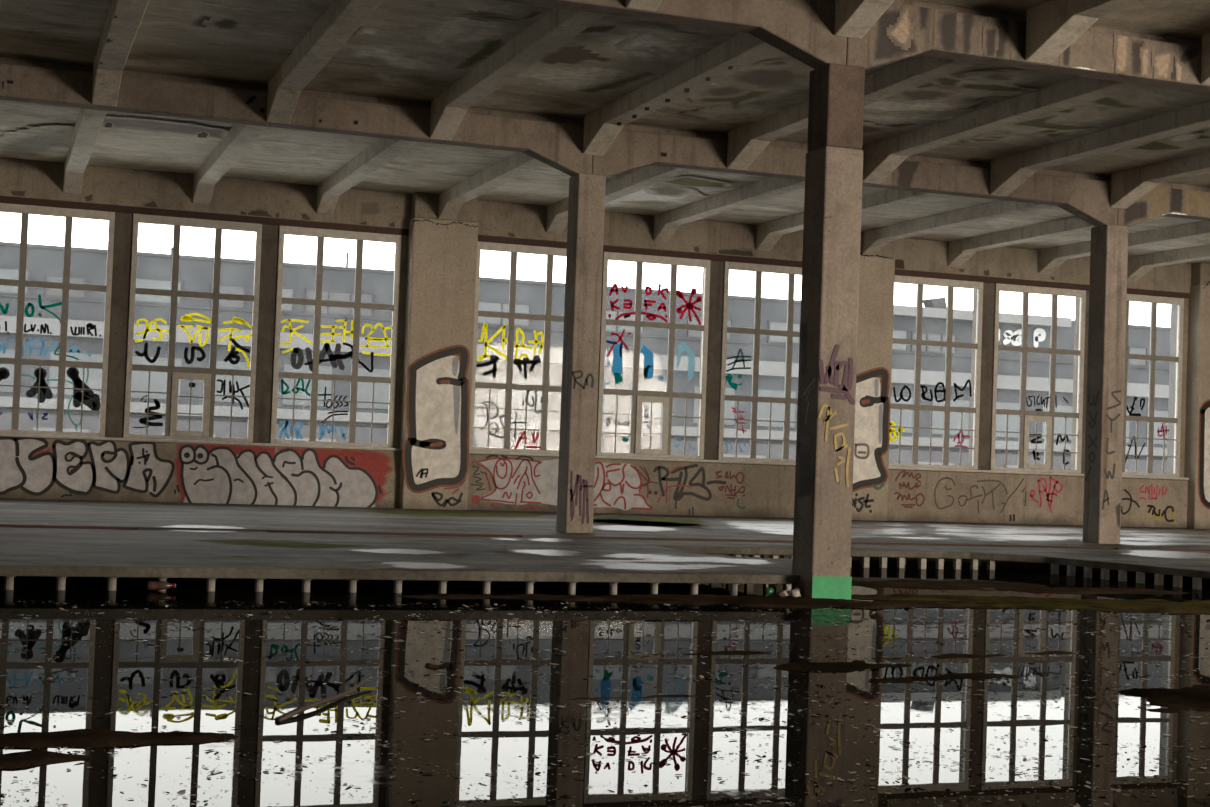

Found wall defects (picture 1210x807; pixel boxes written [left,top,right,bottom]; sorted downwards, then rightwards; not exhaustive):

damp [332,0,532,94]
damp [510,23,713,95]